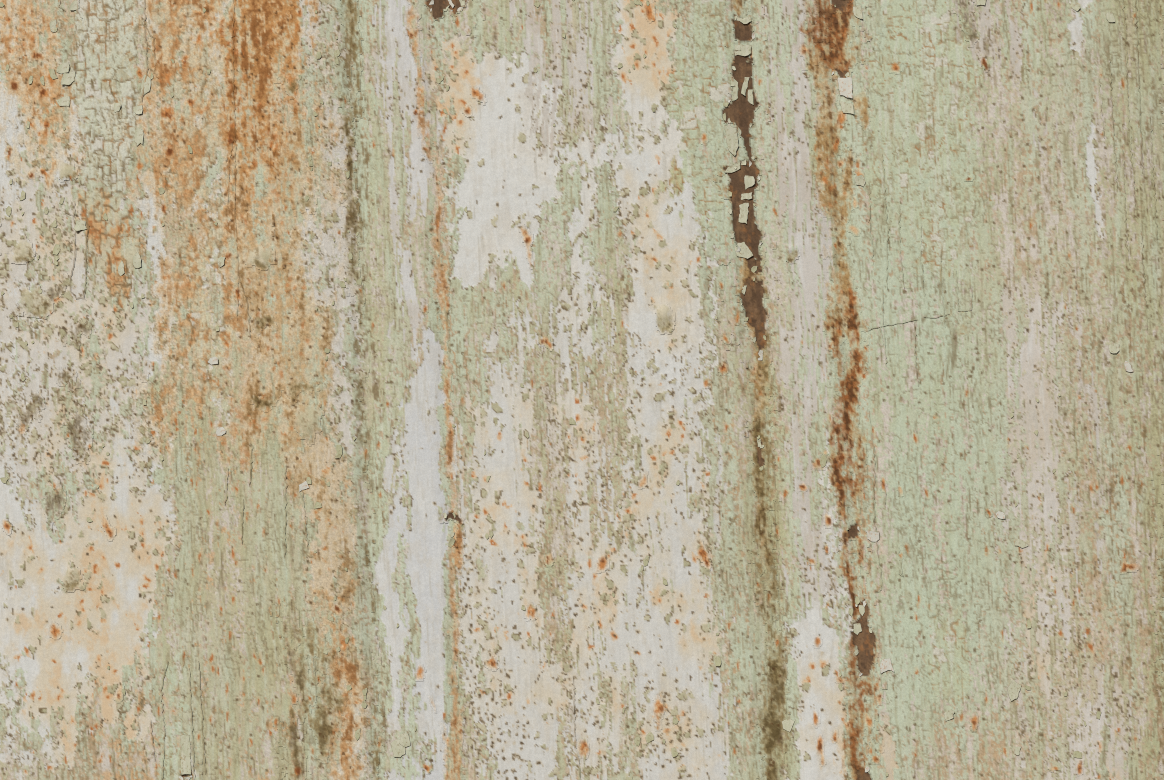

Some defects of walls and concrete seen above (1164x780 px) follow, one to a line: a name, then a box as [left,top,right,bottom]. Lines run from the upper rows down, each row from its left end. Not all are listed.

peeling [0,109,185,780]
crack [49,0,251,335]
corrosion [0,0,380,780]
crack [201,357,229,436]
crack [224,444,253,542]
crack [284,466,309,557]
peeling [281,0,742,780]
peeling [708,0,880,780]
corrosion [797,0,904,780]